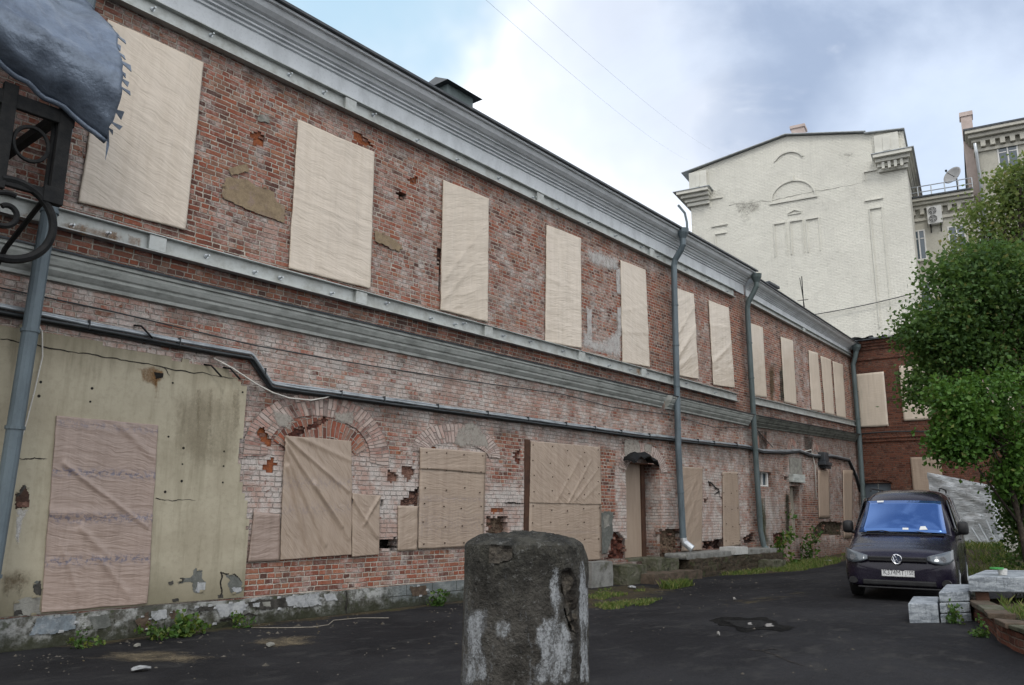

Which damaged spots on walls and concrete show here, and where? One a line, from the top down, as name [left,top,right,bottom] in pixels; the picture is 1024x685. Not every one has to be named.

leakage [589,251,621,293]
leakage [584,307,621,356]
spalling [257,427,277,473]
spalling [15,485,30,509]
spalling [387,466,418,506]
spalling [486,508,513,563]
peeling [601,511,627,559]
spalling [654,529,679,557]
peeling [168,568,206,593]
peeling [190,573,338,629]
peeling [466,611,487,682]
peeling [536,562,589,683]